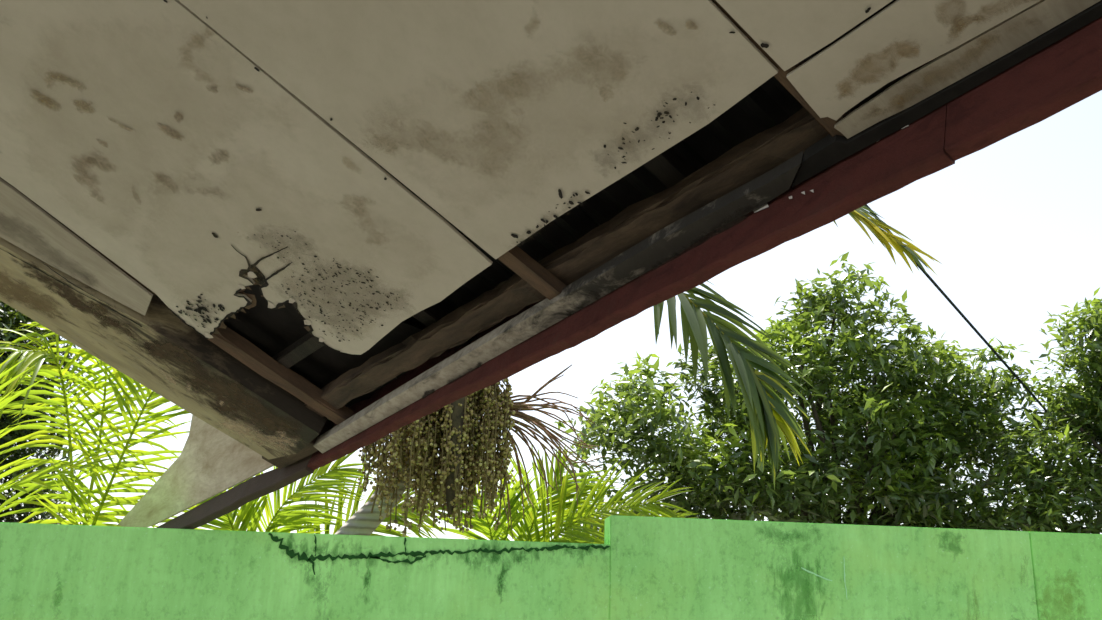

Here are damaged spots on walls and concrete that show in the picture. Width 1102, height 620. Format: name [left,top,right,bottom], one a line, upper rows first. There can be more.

leakage [651,92,715,139]
leakage [254,231,404,342]
crack [268,533,610,575]